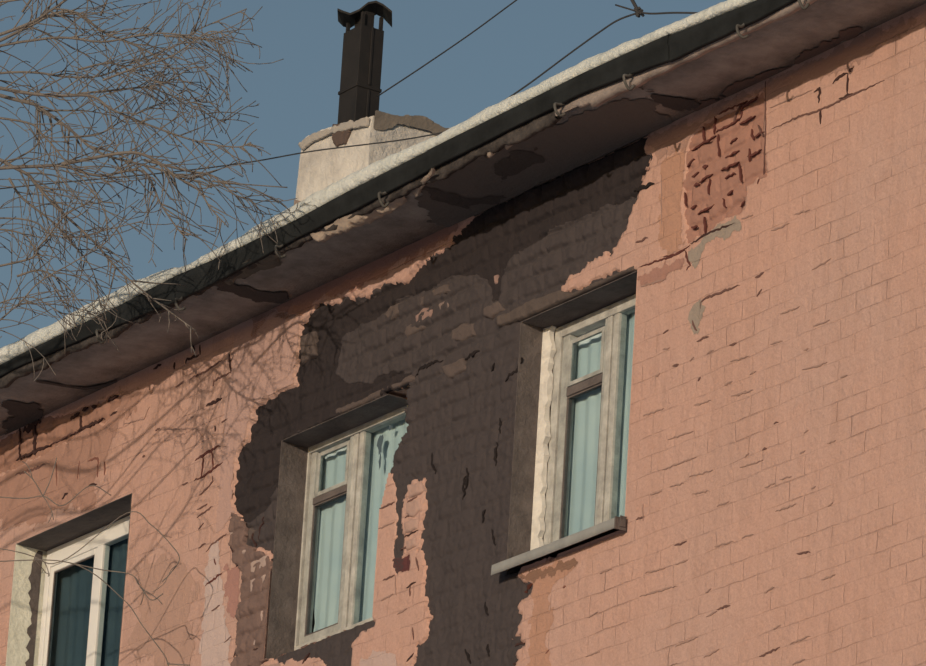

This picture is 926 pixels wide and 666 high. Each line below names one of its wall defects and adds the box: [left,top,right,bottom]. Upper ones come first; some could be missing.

spalling [332,123,351,147]
spalling [683,93,768,270]
crack [763,80,885,175]
spalling [0,394,121,474]
spalling [199,137,653,666]